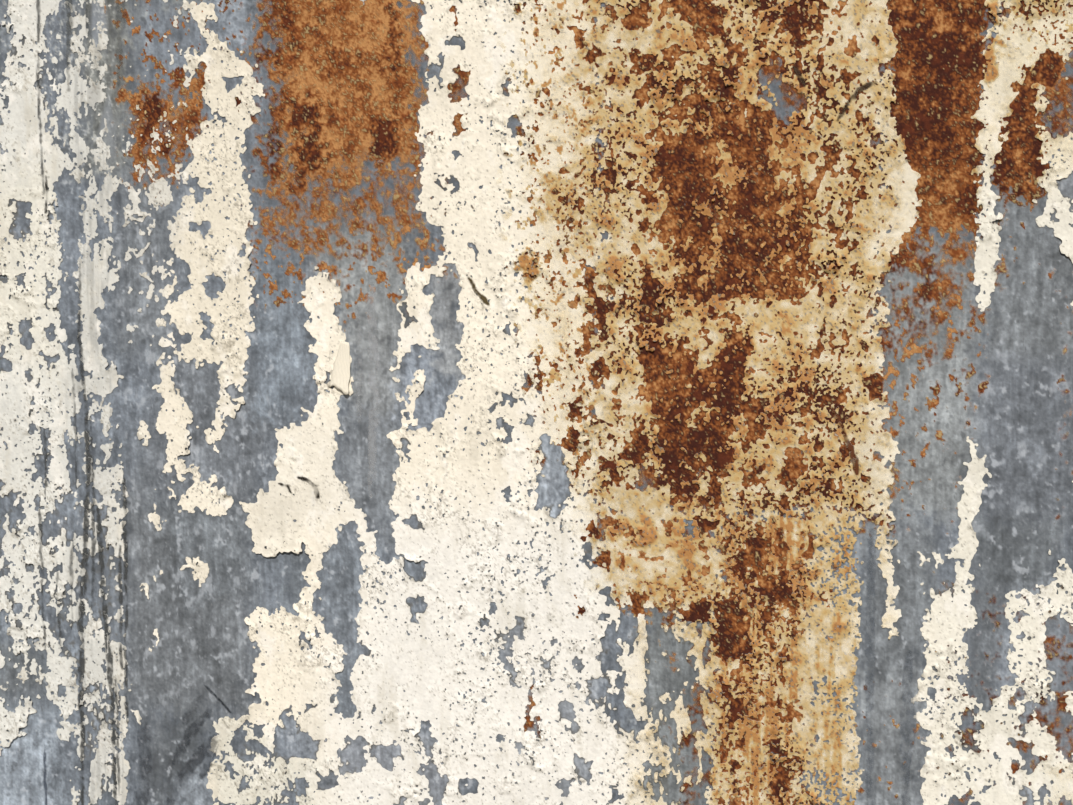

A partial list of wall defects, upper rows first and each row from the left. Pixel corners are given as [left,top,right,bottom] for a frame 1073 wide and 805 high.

corrosion [104,0,211,189]
corrosion [218,0,457,323]
corrosion [447,66,471,135]
spalling [979,0,1022,54]
peeling [0,0,735,805]
corrosion [503,0,1073,805]
peeling [650,40,1073,805]